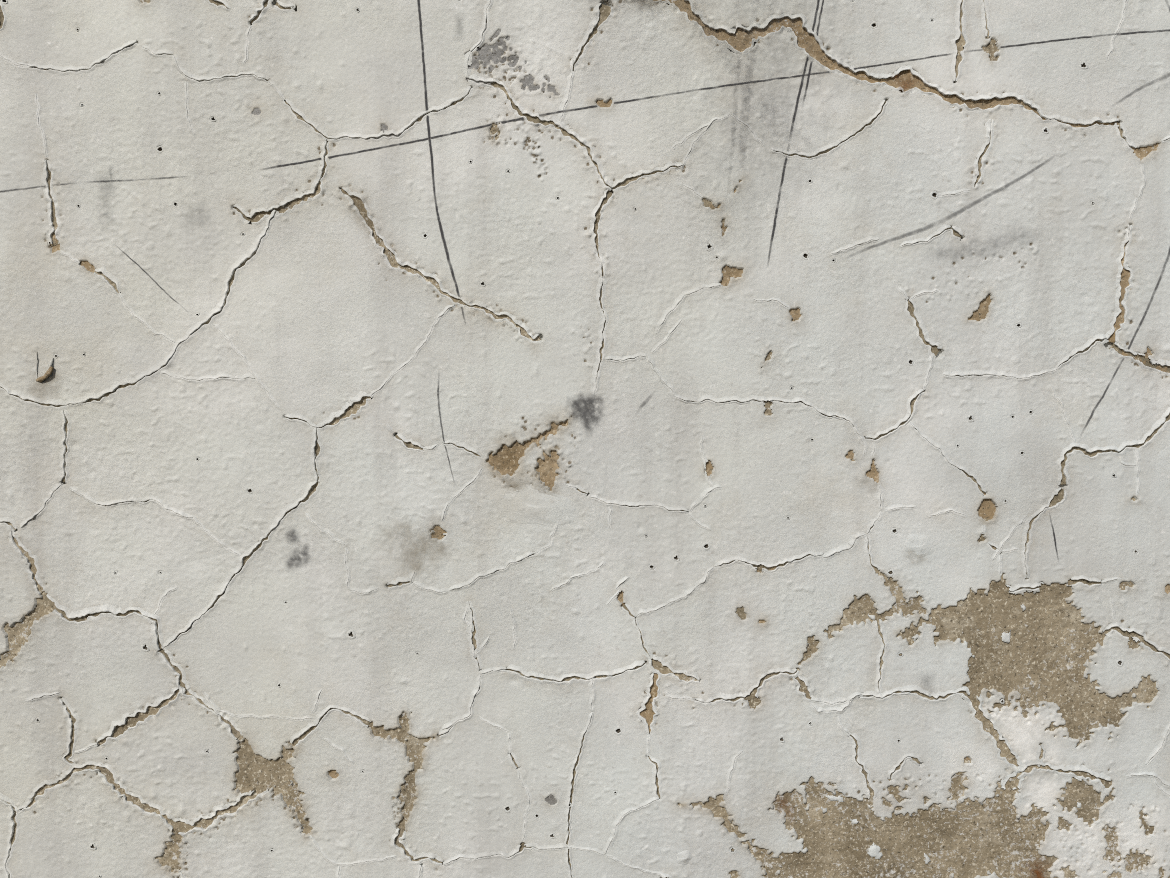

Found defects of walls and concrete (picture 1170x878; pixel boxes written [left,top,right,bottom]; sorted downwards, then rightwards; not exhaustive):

crack [0,1,8,31]
crack [463,0,1170,396]
crack [0,141,541,878]
spalling [486,415,572,491]
crack [854,198,1170,662]
spalling [0,582,69,668]
crack [390,485,1111,878]
peeling [789,566,1158,746]
spalling [233,735,313,834]
spalling [368,712,440,830]
peeling [677,756,1170,878]